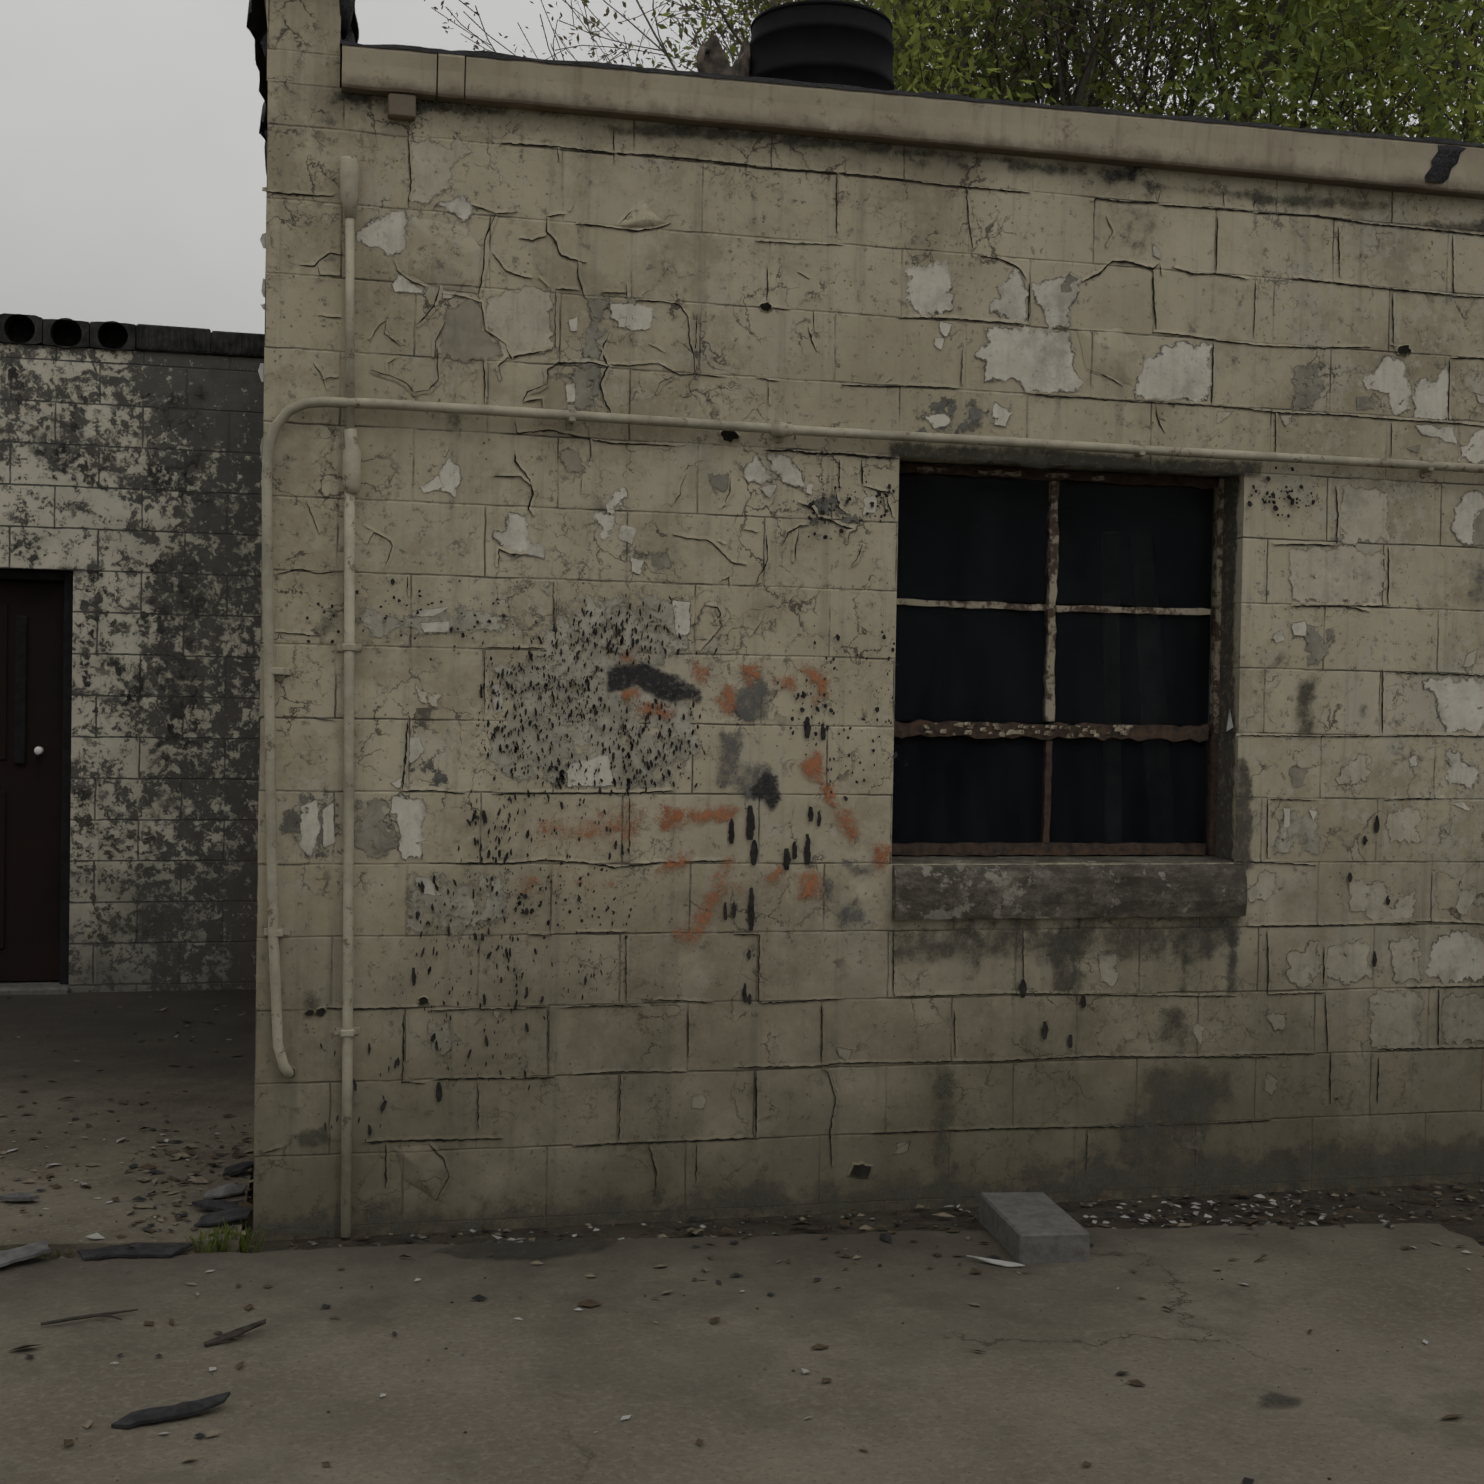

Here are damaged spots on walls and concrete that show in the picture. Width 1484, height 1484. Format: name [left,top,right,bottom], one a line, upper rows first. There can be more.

crack [262,187,334,197]
crack [300,249,342,276]
crack [407,130,415,207]
peeling [355,138,474,257]
crack [501,130,1033,389]
crack [313,200,899,651]
peeling [974,267,1084,397]
peeling [1133,340,1234,423]
peeling [279,486,718,1091]
peeling [1422,676,1484,810]
water stain [894,917,1240,1040]
peeling [1286,878,1484,1051]